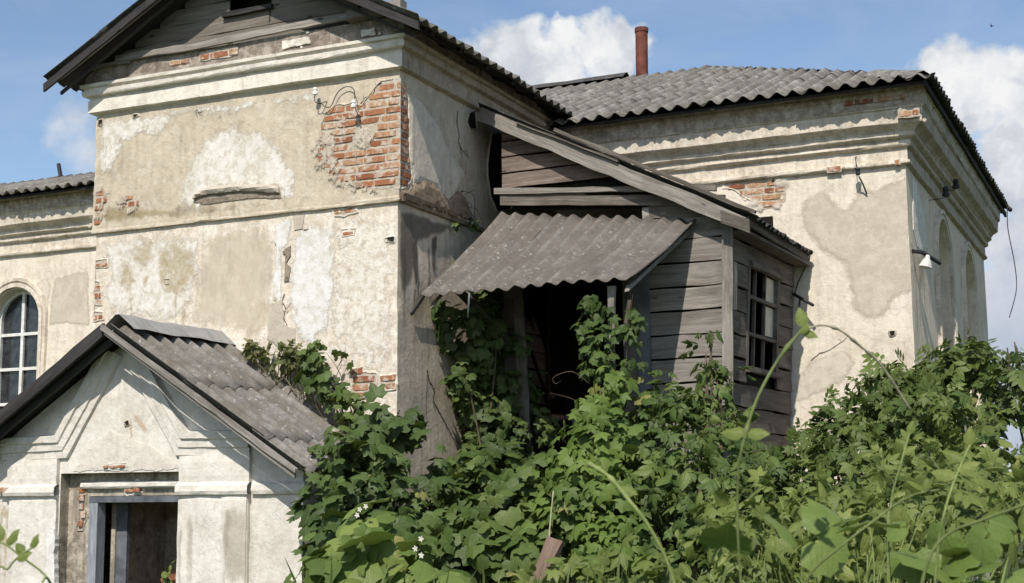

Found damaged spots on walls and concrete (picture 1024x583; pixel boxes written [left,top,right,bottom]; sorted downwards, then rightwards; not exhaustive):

flaking render [170,43,238,66]
peeling [88,93,321,228]
flaking render [310,78,473,221]
flaking render [722,177,789,211]
flaking render [841,92,927,122]
peeling [37,234,200,325]
peeling [267,206,398,398]
flaking render [73,482,89,532]